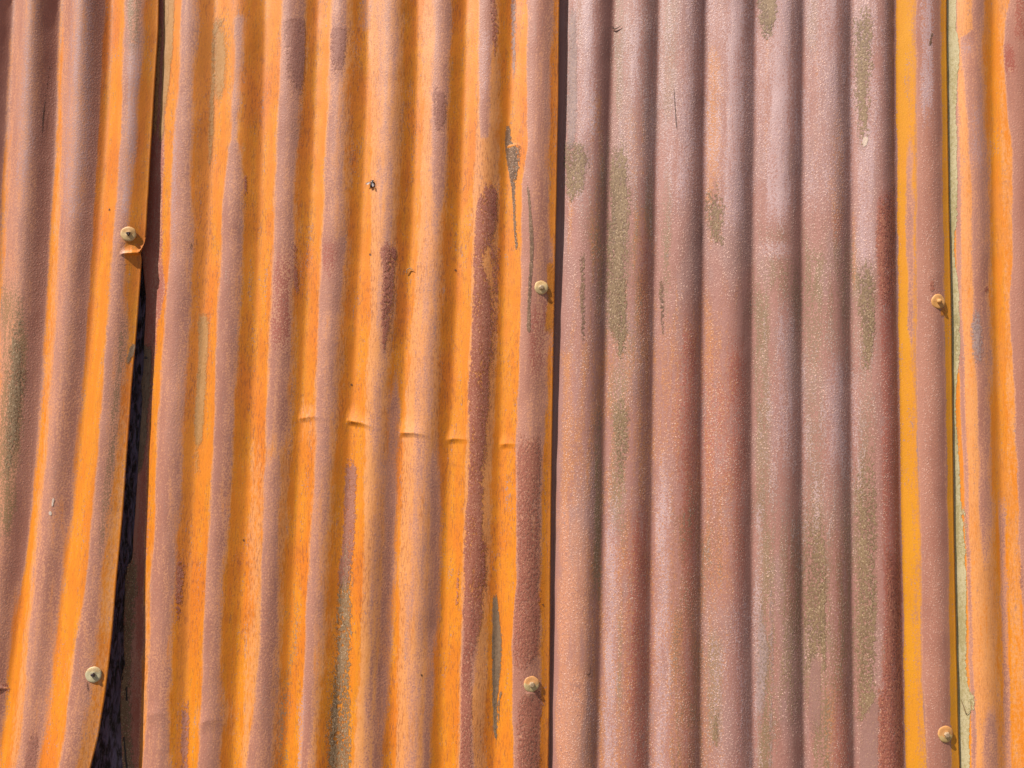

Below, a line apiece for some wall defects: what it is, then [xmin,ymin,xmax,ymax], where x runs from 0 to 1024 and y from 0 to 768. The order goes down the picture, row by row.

corrosion [208,19,226,163]
corrosion [283,17,305,94]
corrosion [330,26,348,73]
corrosion [369,241,396,349]
corrosion [545,263,554,332]
corrosion [875,194,895,305]
corrosion [338,459,357,587]
corrosion [455,183,500,768]
corrosion [512,434,544,677]
corrosion [877,540,904,768]
corrosion [180,701,190,768]
corrosion [516,691,543,768]